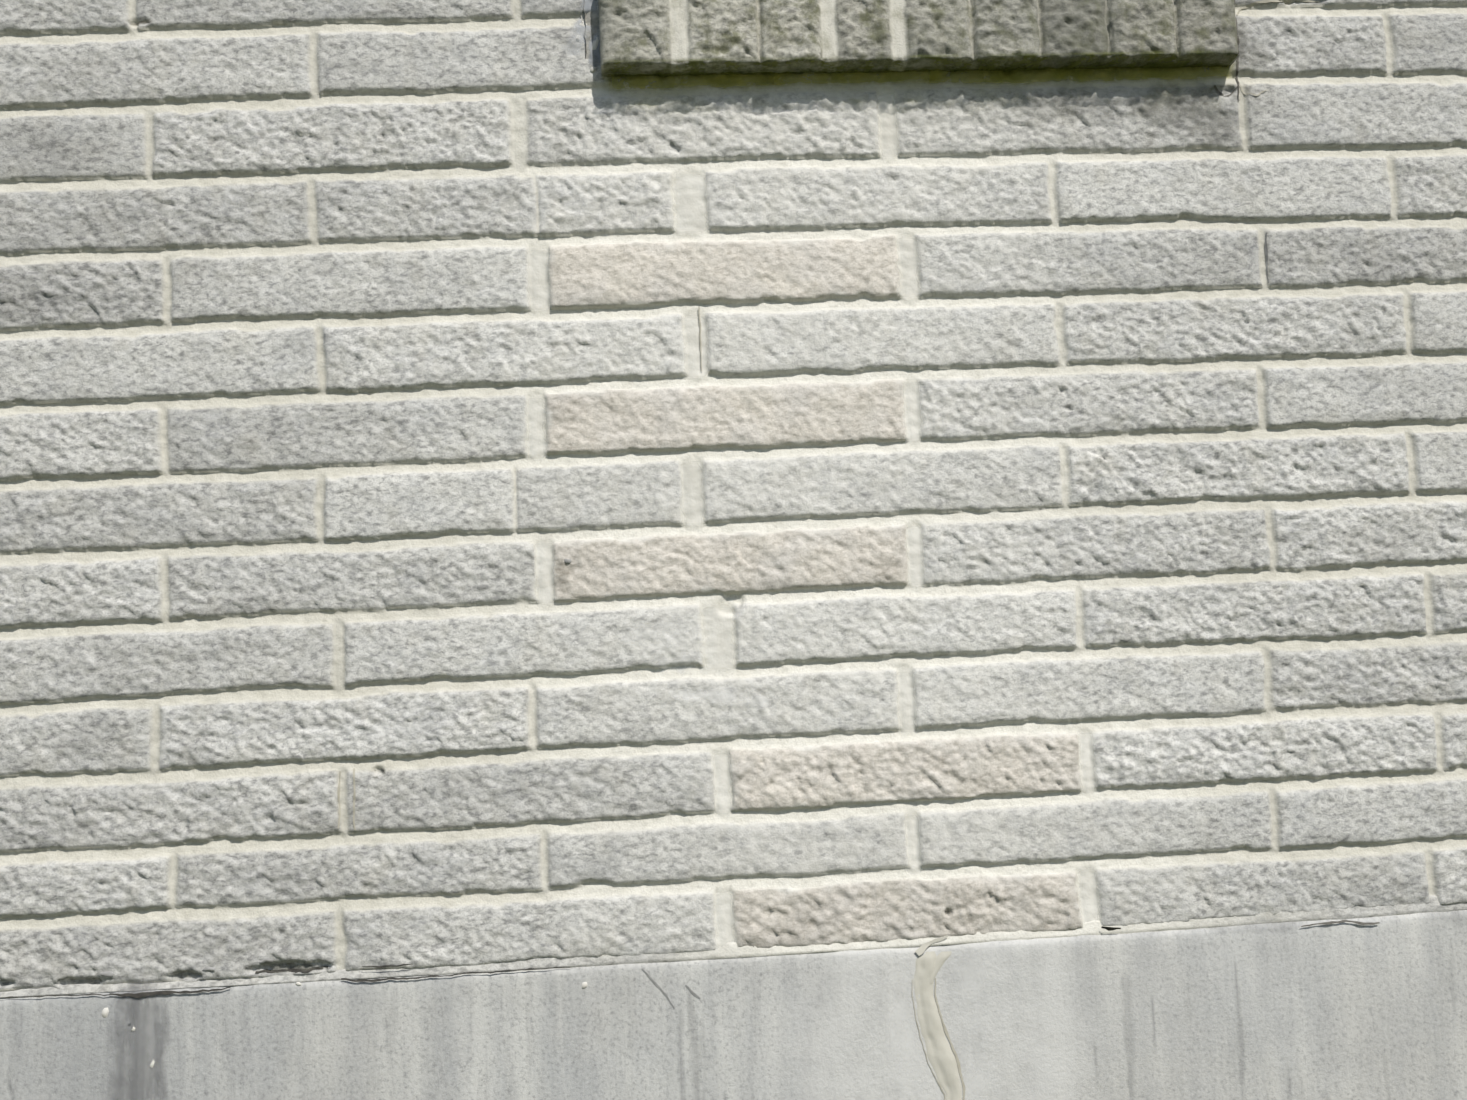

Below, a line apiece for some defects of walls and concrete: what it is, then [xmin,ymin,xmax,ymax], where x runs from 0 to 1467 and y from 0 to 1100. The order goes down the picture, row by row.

water stain [112,986,167,1100]
crack [912,935,965,1100]